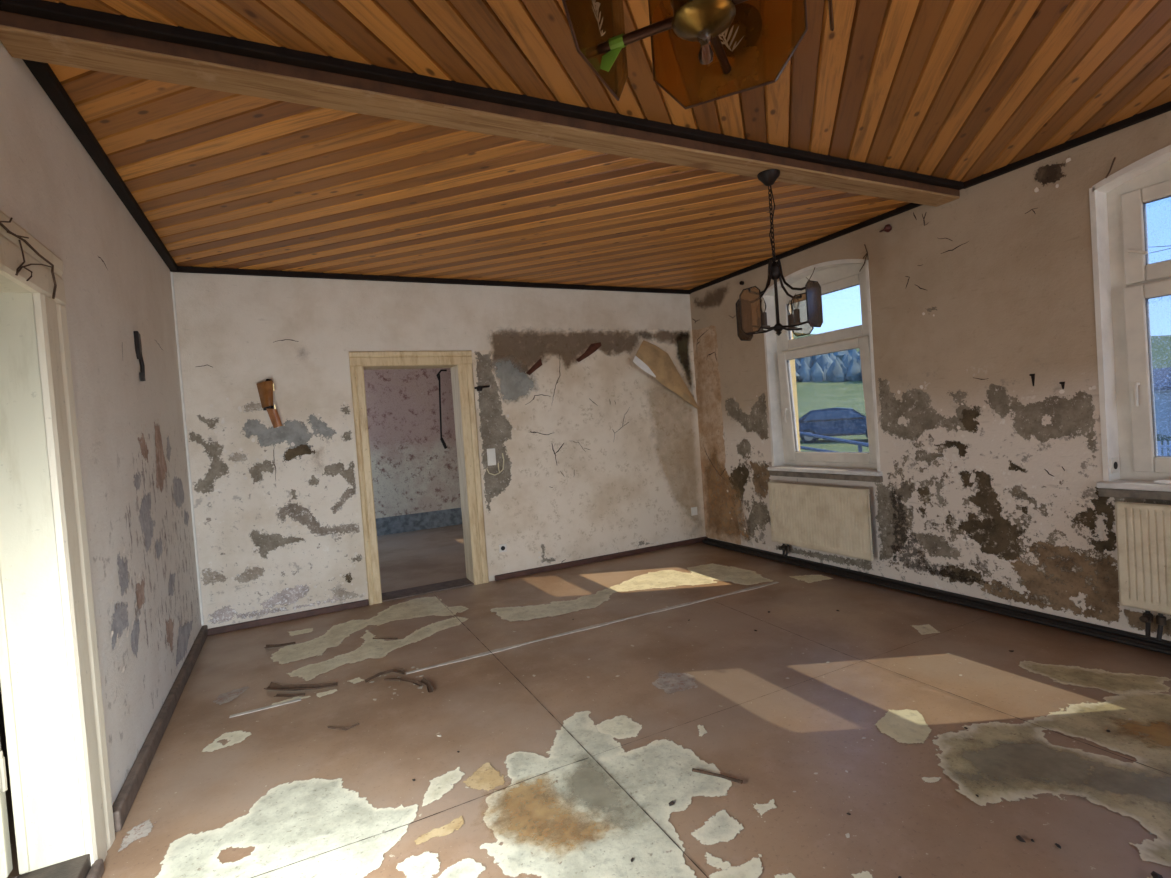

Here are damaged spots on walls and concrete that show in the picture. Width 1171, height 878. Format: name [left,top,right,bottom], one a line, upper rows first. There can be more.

peeling [1034,158,1071,192]
water stain [695,288,727,307]
peeling [472,350,516,510]
peeling [111,397,367,667]
peeling [725,378,1171,636]
peeling [490,563,773,622]
peeling [270,596,469,681]
peeling [272,677,364,705]
peeling [118,819,161,852]
peeling [155,711,795,878]
corrosion [491,779,608,850]
peeling [875,660,1171,878]